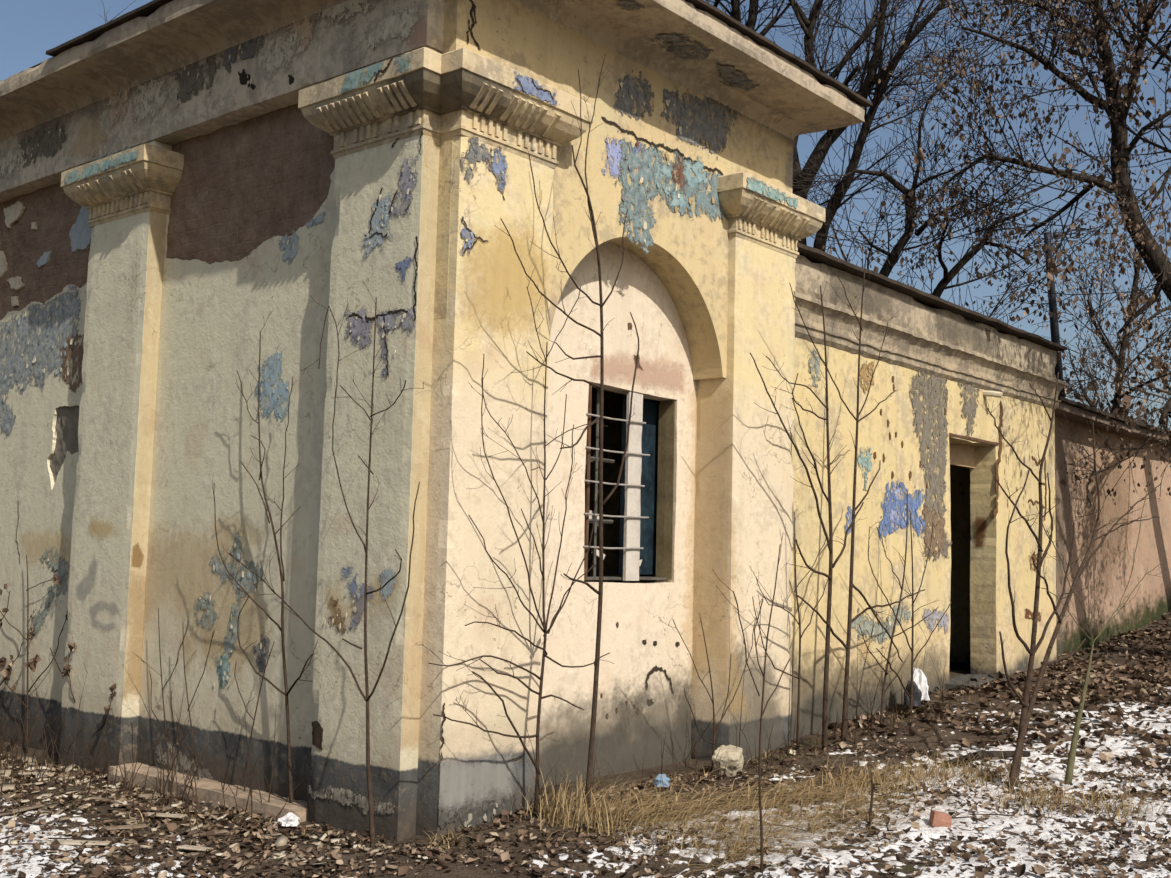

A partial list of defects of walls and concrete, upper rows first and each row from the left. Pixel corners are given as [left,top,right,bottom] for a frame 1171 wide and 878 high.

crack [467,0,481,50]
spalling [166,103,335,265]
peeling [361,156,418,259]
peeling [461,137,508,198]
crack [601,116,723,185]
peeling [602,69,737,255]
spalling [0,144,138,439]
spalling [48,406,80,483]
peeling [858,408,946,560]
peeling [33,544,70,634]
peeling [193,532,266,689]
leakage [539,685,692,788]